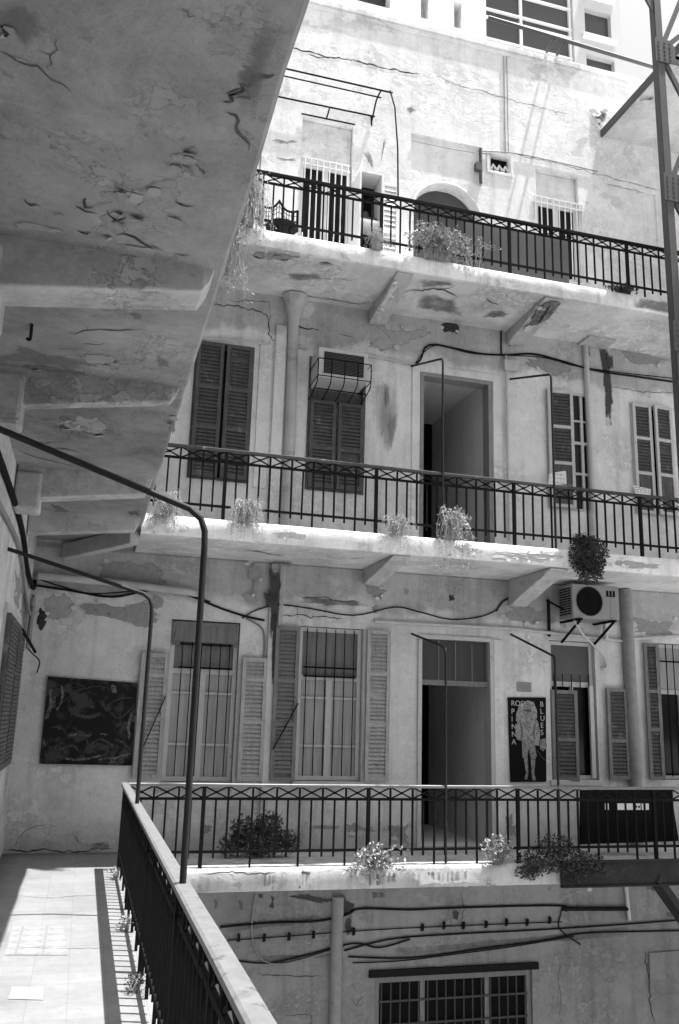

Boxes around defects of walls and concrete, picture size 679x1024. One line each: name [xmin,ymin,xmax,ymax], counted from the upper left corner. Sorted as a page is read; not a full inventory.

crack [0,39,68,89]
crack [224,75,274,150]
peeling [77,148,205,251]
crack [215,299,275,345]
peeling [370,281,462,353]
spalling [524,301,561,332]
peeling [41,415,107,438]
water stain [382,389,395,441]
peeling [36,559,169,631]
water stain [264,569,282,681]